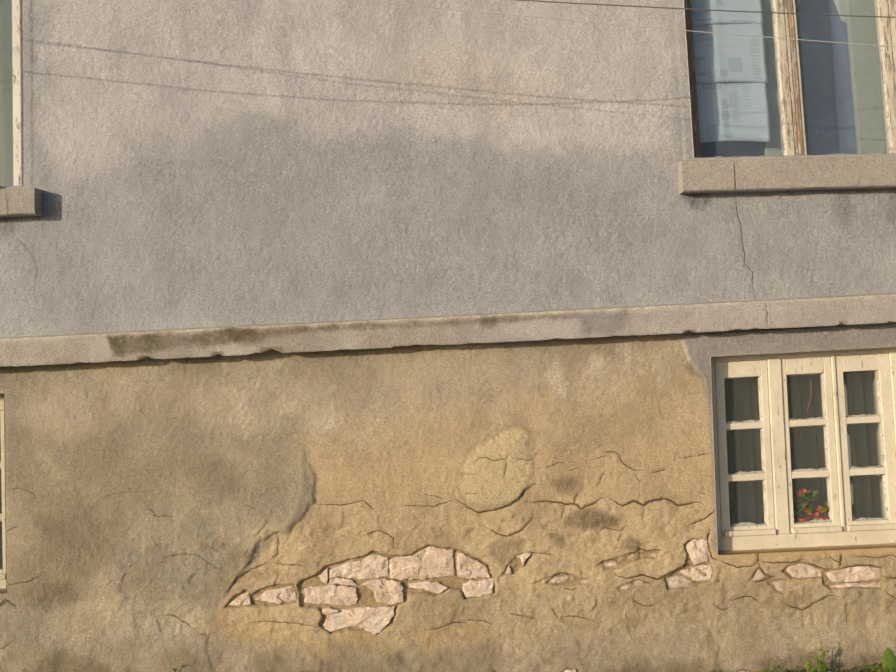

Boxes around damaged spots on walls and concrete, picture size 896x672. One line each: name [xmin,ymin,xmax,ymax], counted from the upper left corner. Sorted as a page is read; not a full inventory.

crack [733,162,767,321]
water stain [184,329,264,344]
crack [323,500,394,547]
crack [406,451,896,610]
spalling [226,545,531,635]
crack [424,607,593,630]
crack [595,527,690,639]
spalling [665,538,714,589]
spalling [749,562,883,594]
crack [785,595,847,631]